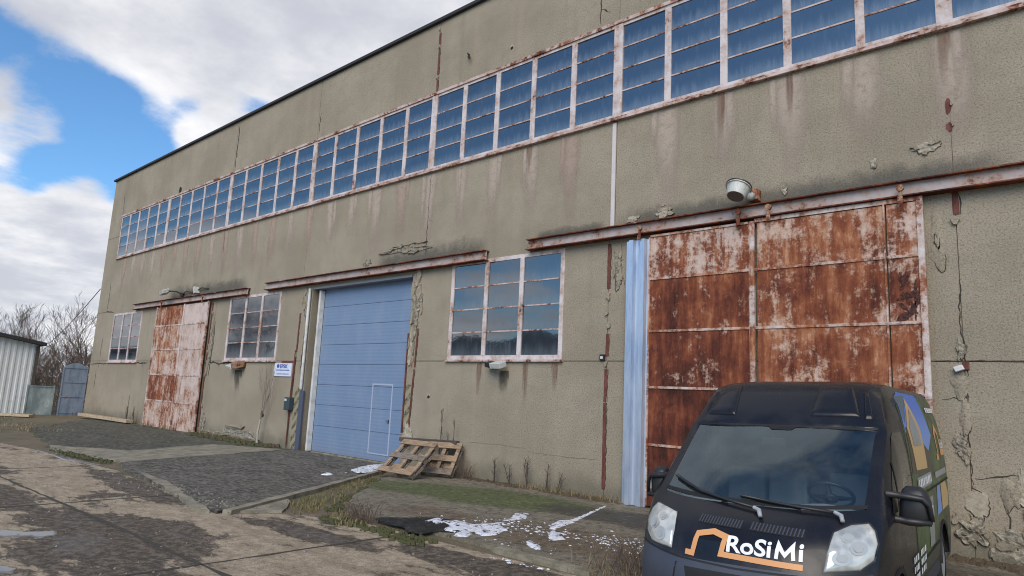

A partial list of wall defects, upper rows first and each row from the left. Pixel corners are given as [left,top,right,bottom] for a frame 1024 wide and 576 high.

leakage [651,108,677,174]
leakage [770,74,804,147]
leakage [842,53,879,118]
rust [945,98,954,132]
leakage [933,29,970,113]
spalling [655,204,675,218]
spalling [407,270,423,367]
rust [601,244,612,489]
rust [896,270,920,322]
crack [937,281,1024,402]
spalling [951,501,1024,566]
crack [967,430,1020,565]